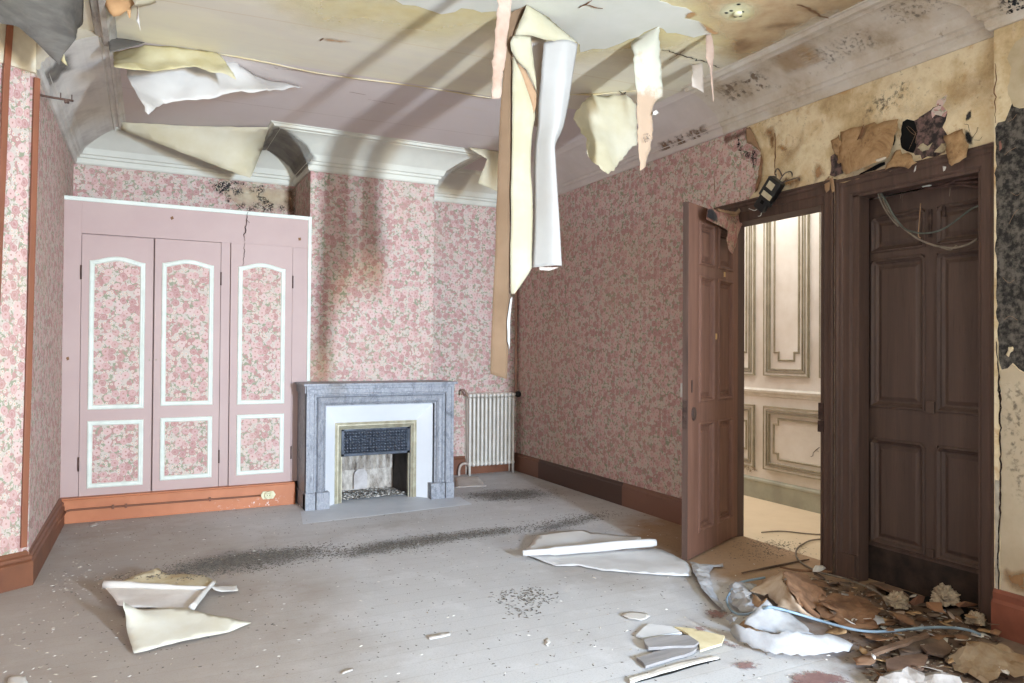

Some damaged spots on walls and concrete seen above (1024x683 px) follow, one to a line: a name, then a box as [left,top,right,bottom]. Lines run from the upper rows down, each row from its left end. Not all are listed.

water stain [354,3,497,21]
peeling [396,0,718,53]
water stain [626,27,678,42]
water stain [670,0,861,54]
water stain [726,73,767,100]
flaking render [1007,37,1024,108]
peeling [746,37,994,199]
water stain [210,181,294,214]
peeling [706,205,743,254]
flaking render [995,364,1024,596]